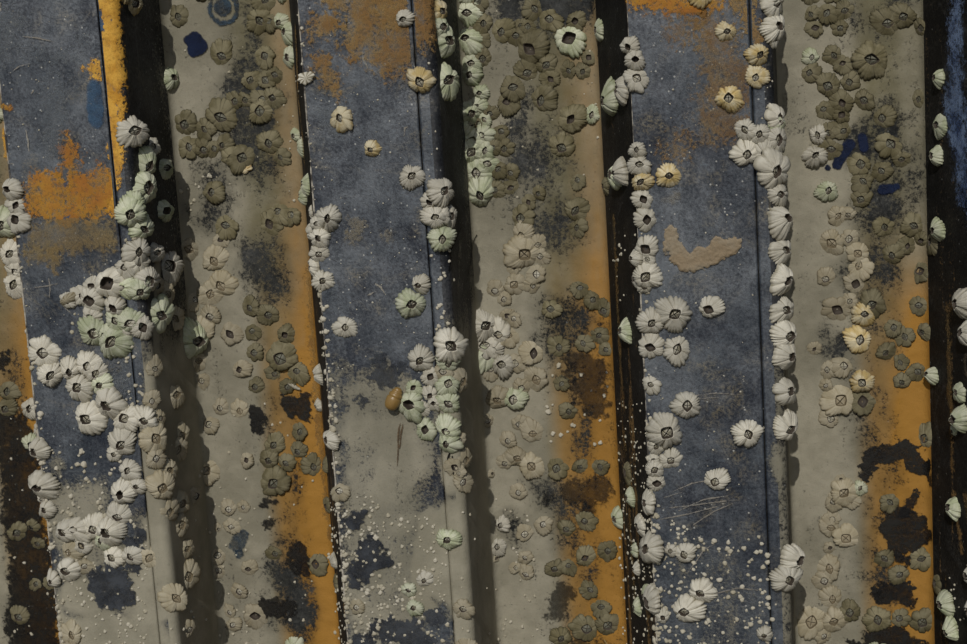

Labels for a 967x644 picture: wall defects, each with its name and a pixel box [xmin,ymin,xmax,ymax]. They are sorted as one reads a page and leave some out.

rust [625,0,764,44]
rust [21,0,129,275]
peeling [366,352,408,390]
peeling [121,528,147,549]
peeling [342,508,394,590]
peeling [86,562,141,612]
peeling [352,608,446,644]